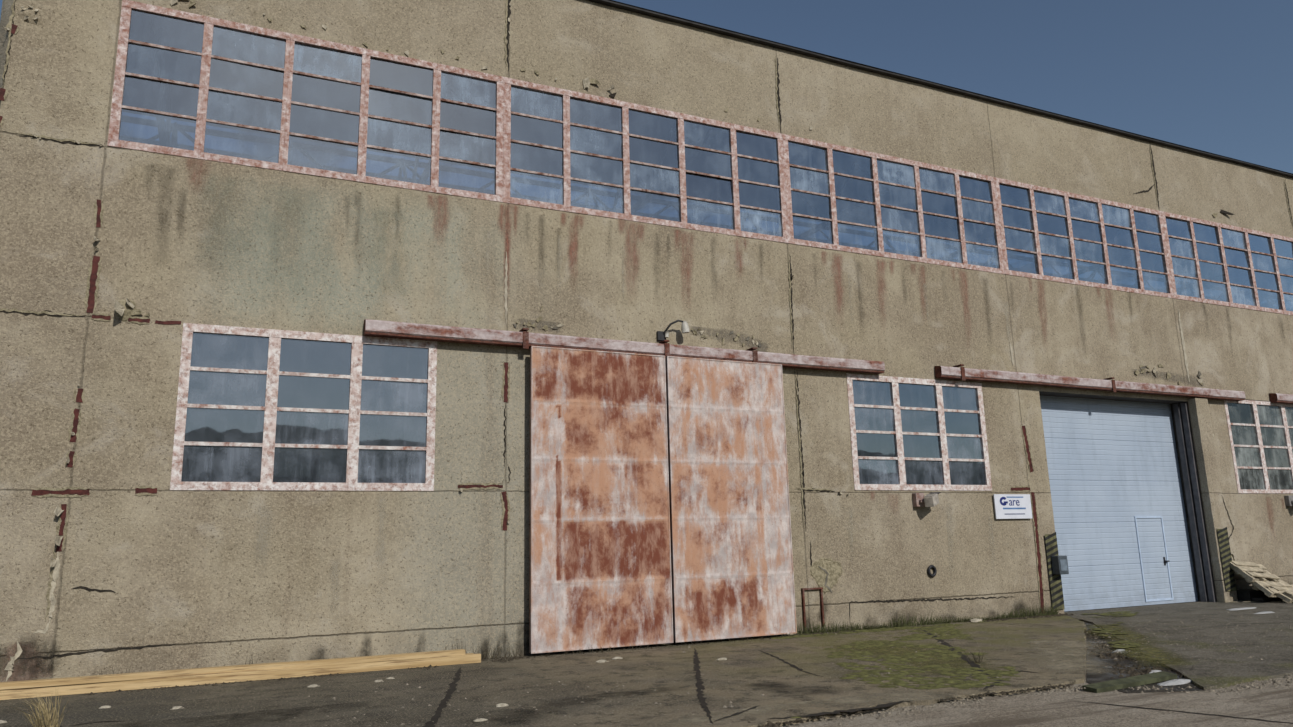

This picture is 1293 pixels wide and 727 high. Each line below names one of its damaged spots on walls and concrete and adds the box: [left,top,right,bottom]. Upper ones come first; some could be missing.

crack [17,548,176,659]